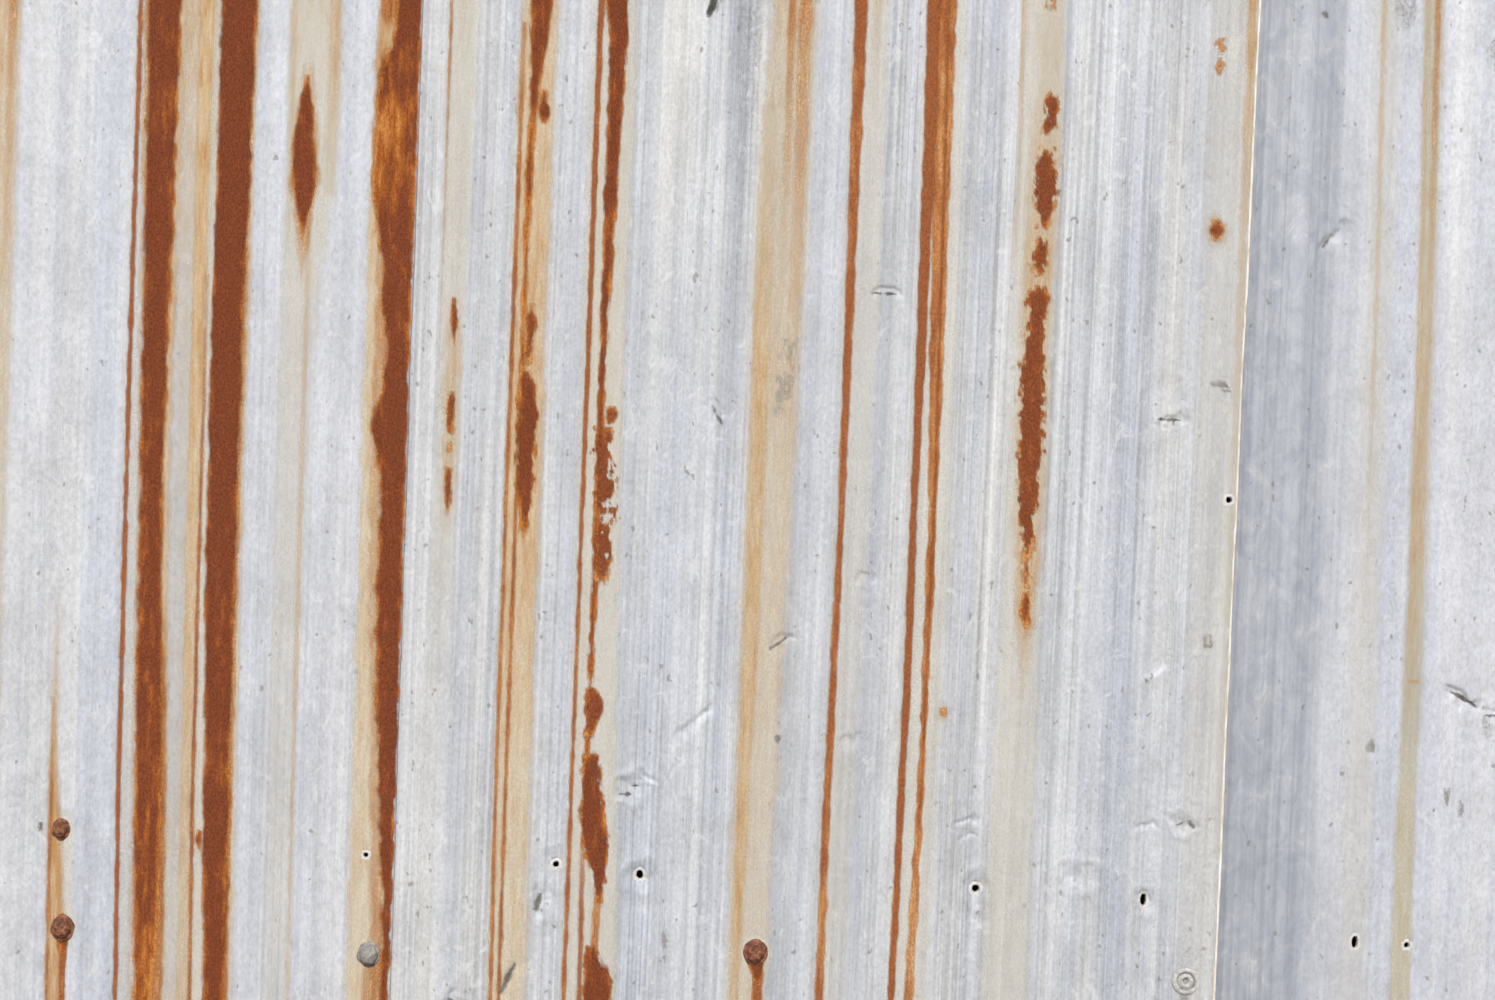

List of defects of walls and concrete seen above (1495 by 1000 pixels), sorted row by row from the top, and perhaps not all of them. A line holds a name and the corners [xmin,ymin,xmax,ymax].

corrosion [45,697,71,1000]
corrosion [112,0,186,1000]
corrosion [193,0,260,1000]
corrosion [289,75,320,268]
corrosion [346,0,422,1000]
corrosion [488,0,559,1000]
corrosion [561,0,635,1000]
corrosion [742,936,768,1000]
corrosion [815,0,885,1000]
corrosion [888,0,964,1000]
corrosion [1015,91,1060,655]
corrosion [1210,219,1224,241]